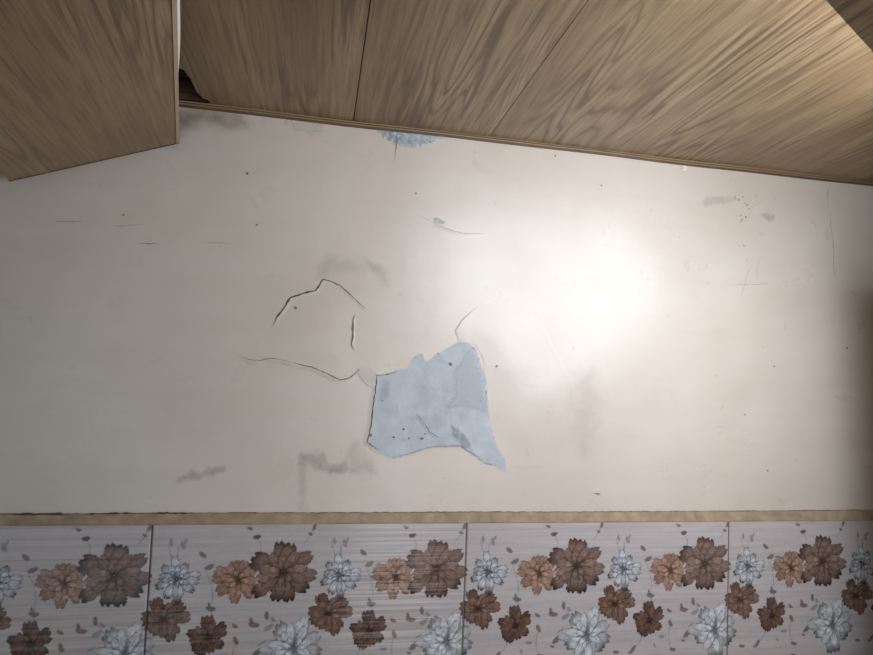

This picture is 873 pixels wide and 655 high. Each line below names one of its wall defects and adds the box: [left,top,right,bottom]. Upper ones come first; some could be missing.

spalling [376,130,450,160]
crack [220,279,369,385]
spalling [357,339,508,473]